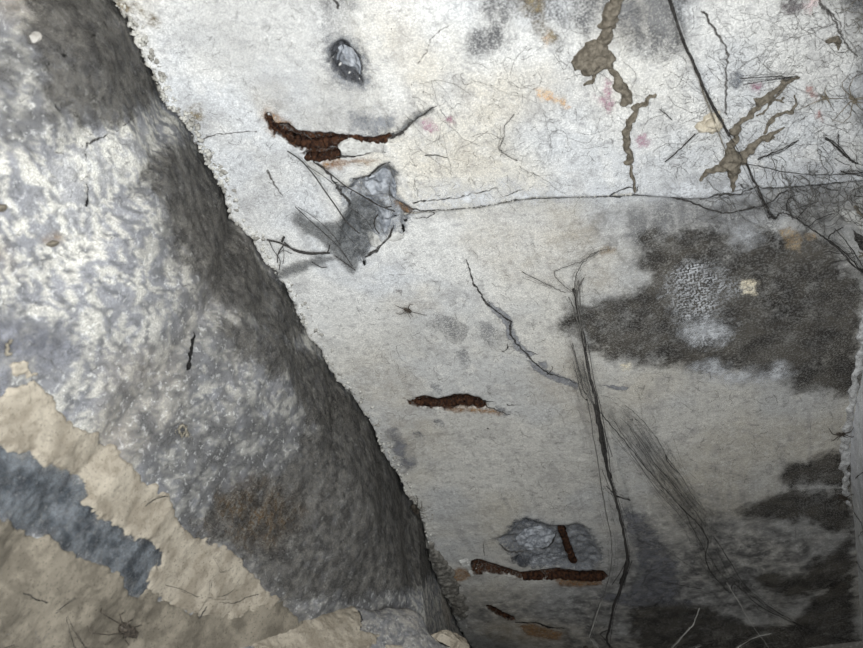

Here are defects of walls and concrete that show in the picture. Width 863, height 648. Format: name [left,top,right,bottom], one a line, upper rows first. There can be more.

water stain [492,0,608,42]
water stain [617,0,688,57]
crack [701,11,729,115]
crack [819,0,858,57]
spalling [264,106,437,266]
crack [410,187,651,219]
crack [466,259,578,389]
water stain [559,182,863,397]
spalling [424,516,608,620]
water stain [594,452,862,648]
flaking render [431,630,470,648]
spalling [486,605,564,640]